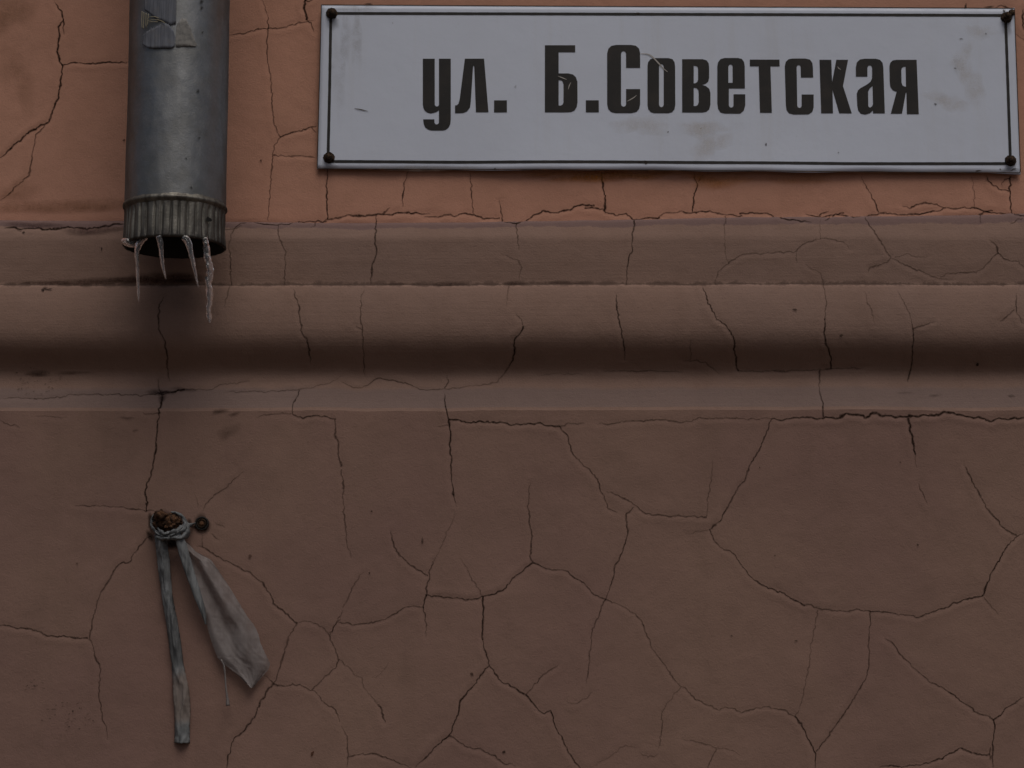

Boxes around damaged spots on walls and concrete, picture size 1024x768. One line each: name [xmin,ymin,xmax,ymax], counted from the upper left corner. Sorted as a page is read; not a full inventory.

crack [6,222,120,230]
crack [3,4,124,198]
crack [226,0,1024,285]
crack [0,541,144,730]
crack [84,305,212,512]
crack [203,547,311,629]
crack [227,648,339,763]
crack [292,390,344,485]
crack [340,289,1024,767]